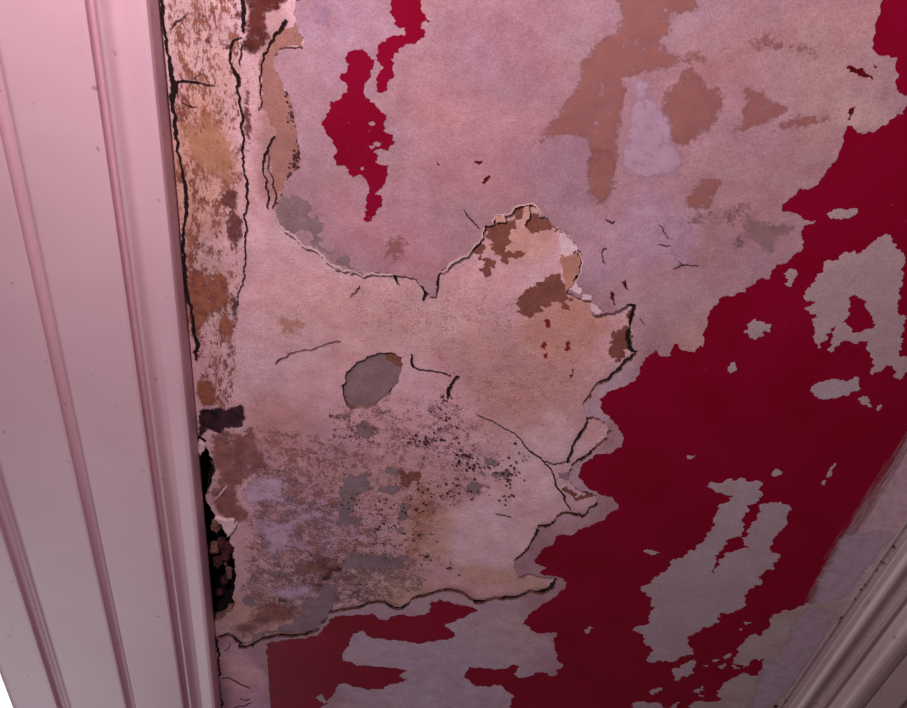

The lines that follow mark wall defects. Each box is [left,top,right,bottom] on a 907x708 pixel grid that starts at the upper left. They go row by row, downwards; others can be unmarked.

crack [160,0,287,361]
crack [275,340,340,364]
damp [198,393,529,637]
spalling [159,0,634,708]
crack [410,354,459,398]
crack [476,304,644,561]
peeling [272,0,907,577]
crack [658,225,699,269]
peeling [632,478,848,708]